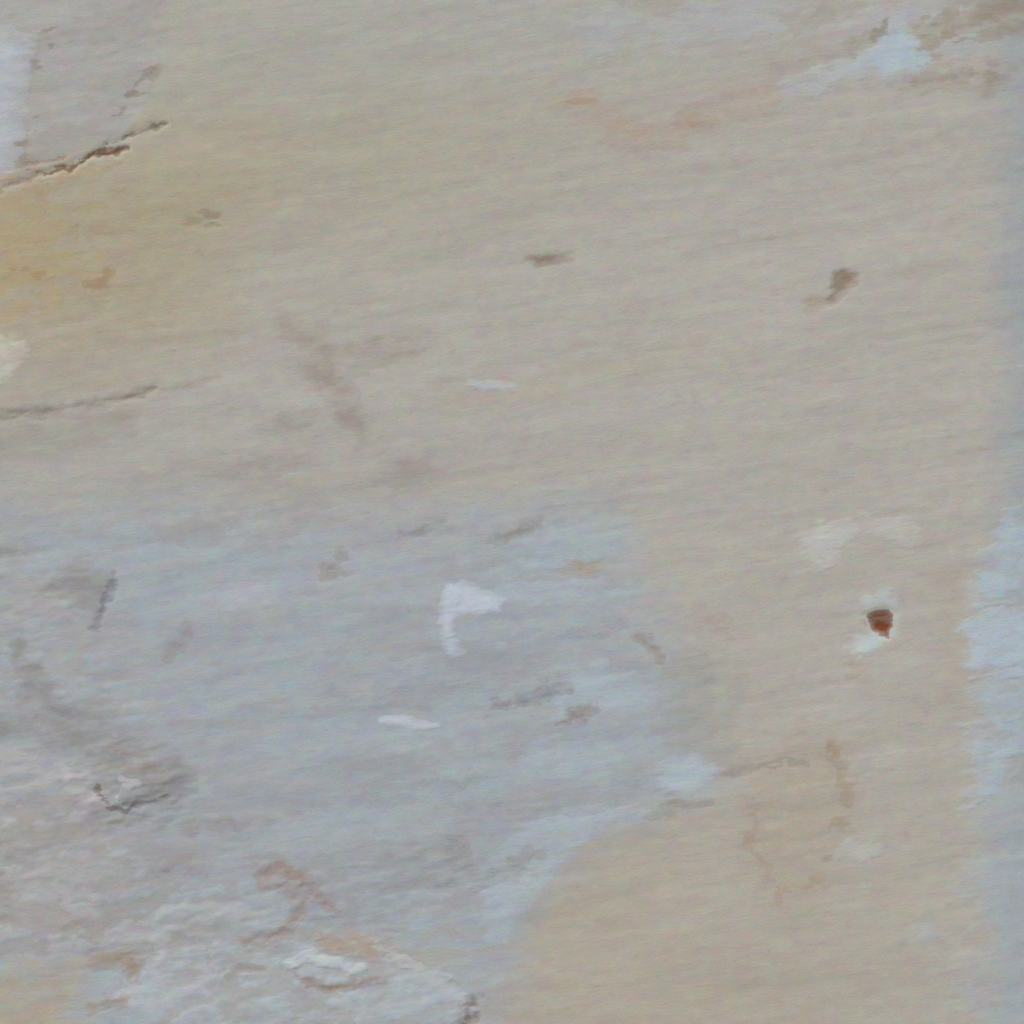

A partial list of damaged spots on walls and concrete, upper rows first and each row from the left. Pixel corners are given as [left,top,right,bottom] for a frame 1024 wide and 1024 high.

peeling [555,0,816,66]
peeling [775,0,1012,109]
crack [0,121,169,197]
crack [0,373,224,473]
crack [35,550,119,632]
peeling [0,463,741,1024]